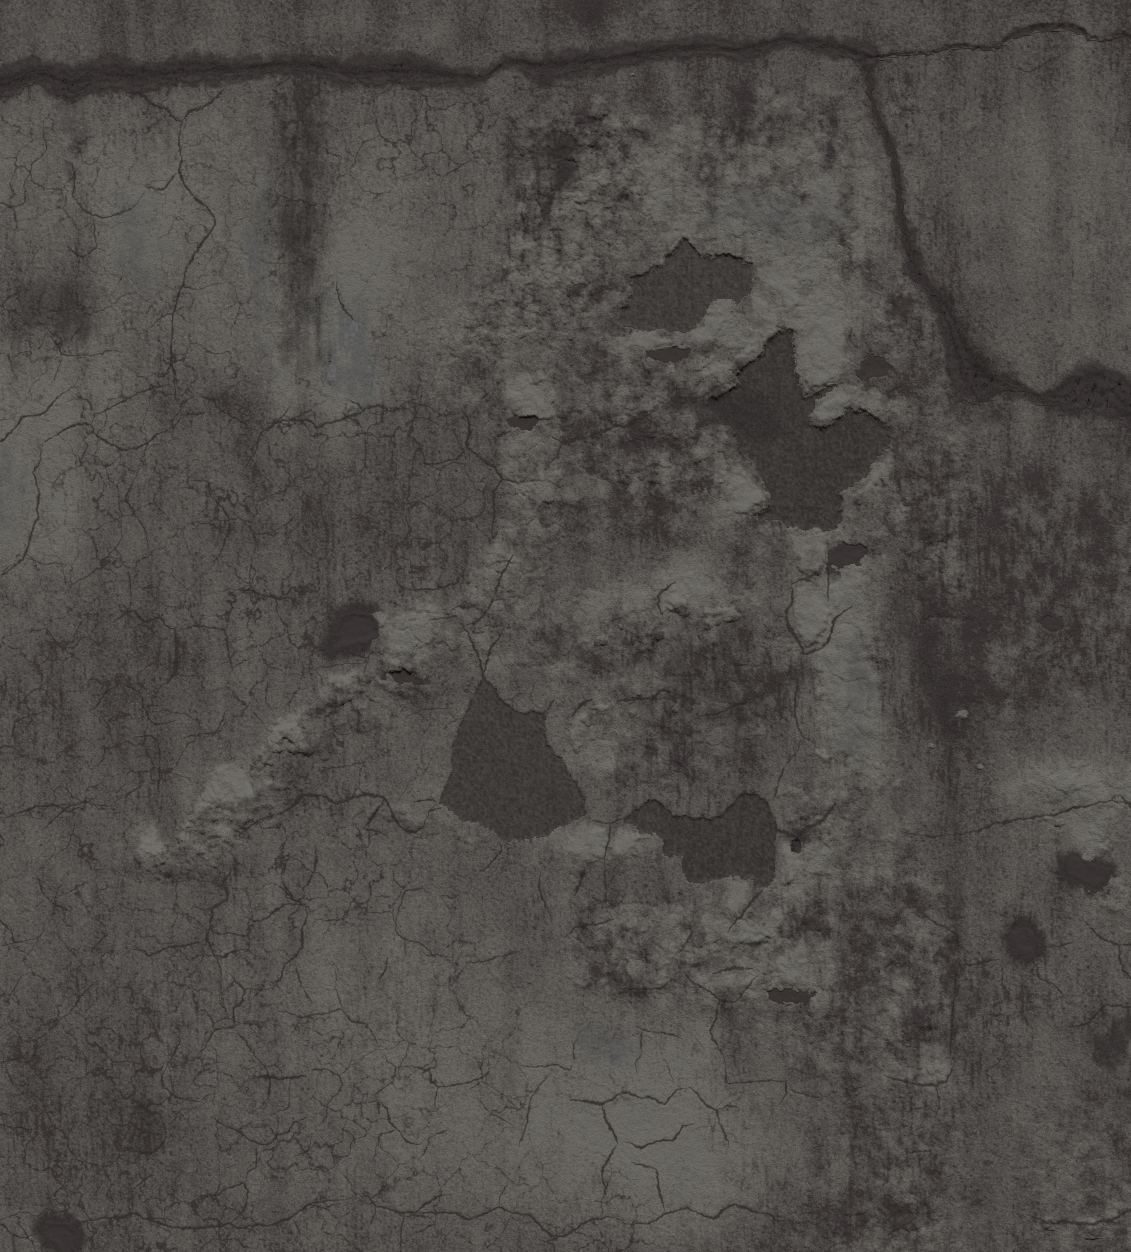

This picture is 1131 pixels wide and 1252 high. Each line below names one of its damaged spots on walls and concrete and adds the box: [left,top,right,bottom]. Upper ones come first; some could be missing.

crack [0,21,1131,676]
spalling [402,85,1131,749]
crack [0,577,251,846]
crack [240,793,439,835]
spalling [439,675,586,843]
crack [538,818,622,937]
crack [548,689,676,717]
crack [777,802,836,844]
crack [773,566,850,799]
crack [908,794,1131,838]
crack [76,849,815,1252]
spalling [559,793,1131,1252]